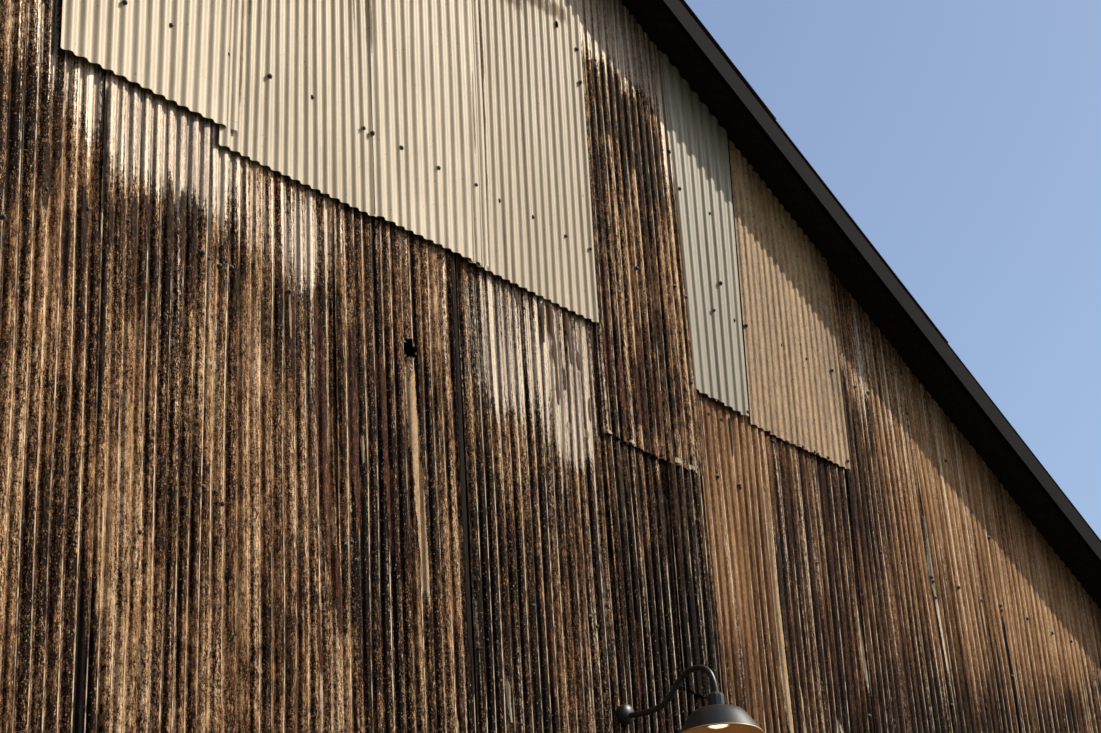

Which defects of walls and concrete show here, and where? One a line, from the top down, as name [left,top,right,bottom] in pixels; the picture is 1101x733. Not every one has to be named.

rust [592,54,667,222]
rust [61,180,89,282]
rust [97,88,150,427]
rust [600,250,664,437]
rust [313,290,343,637]
rust [346,324,363,539]
rust [375,348,396,556]
rust [841,366,876,501]
rust [73,574,85,733]
rust [545,598,558,713]
rust [775,521,793,691]
rust [1002,615,1022,733]